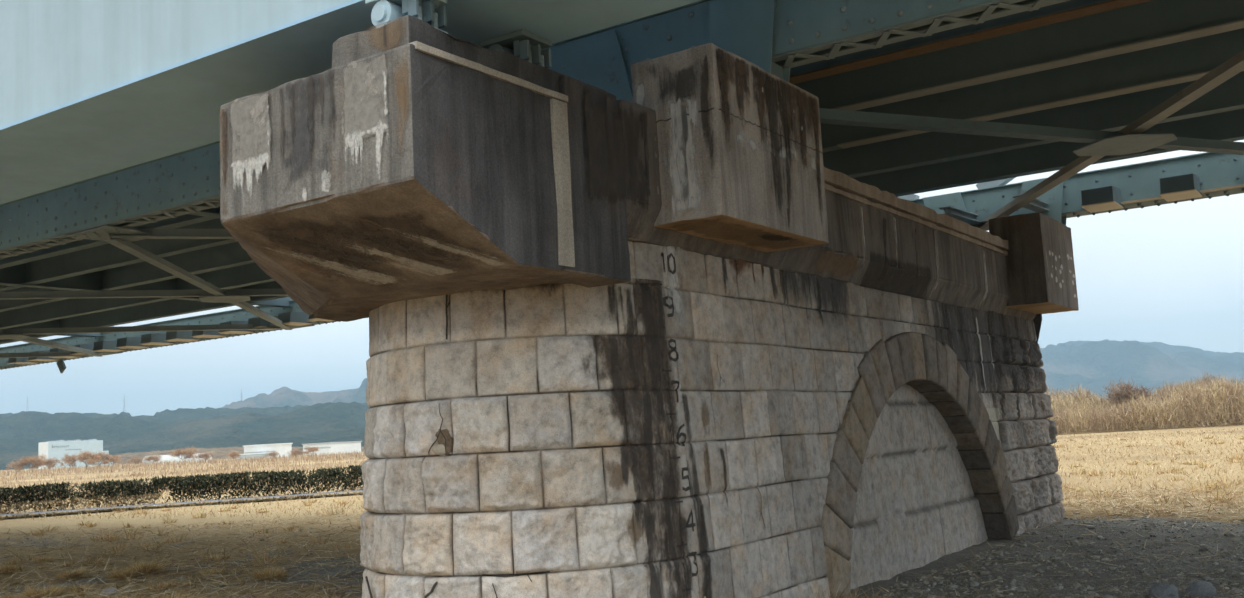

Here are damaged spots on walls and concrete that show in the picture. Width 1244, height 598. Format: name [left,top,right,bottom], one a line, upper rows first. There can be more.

water stain [280,72,335,201]
water stain [585,83,650,208]
water stain [653,48,823,224]
water stain [770,267,846,321]
water stain [860,206,1046,420]
crack [428,408,446,455]
water stain [586,279,712,598]
crack [424,582,438,598]